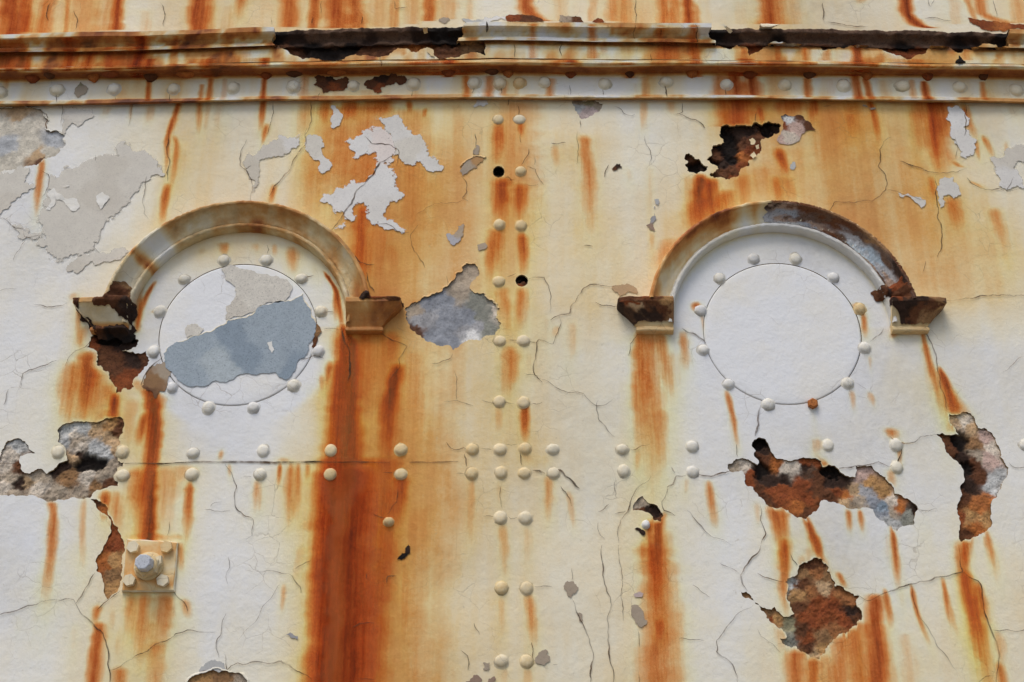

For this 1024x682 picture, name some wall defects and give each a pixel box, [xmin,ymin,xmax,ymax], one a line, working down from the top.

spalling [271,14,543,61]
spalling [709,18,1024,59]
corrosion [73,281,149,411]
corrosion [387,367,398,415]
crack [527,277,617,435]
corrosion [871,276,947,325]
corrosion [145,391,159,540]
crack [663,414,797,590]
spalling [728,438,917,531]
spalling [937,413,1008,542]
crack [860,562,1023,637]
crack [576,612,614,682]